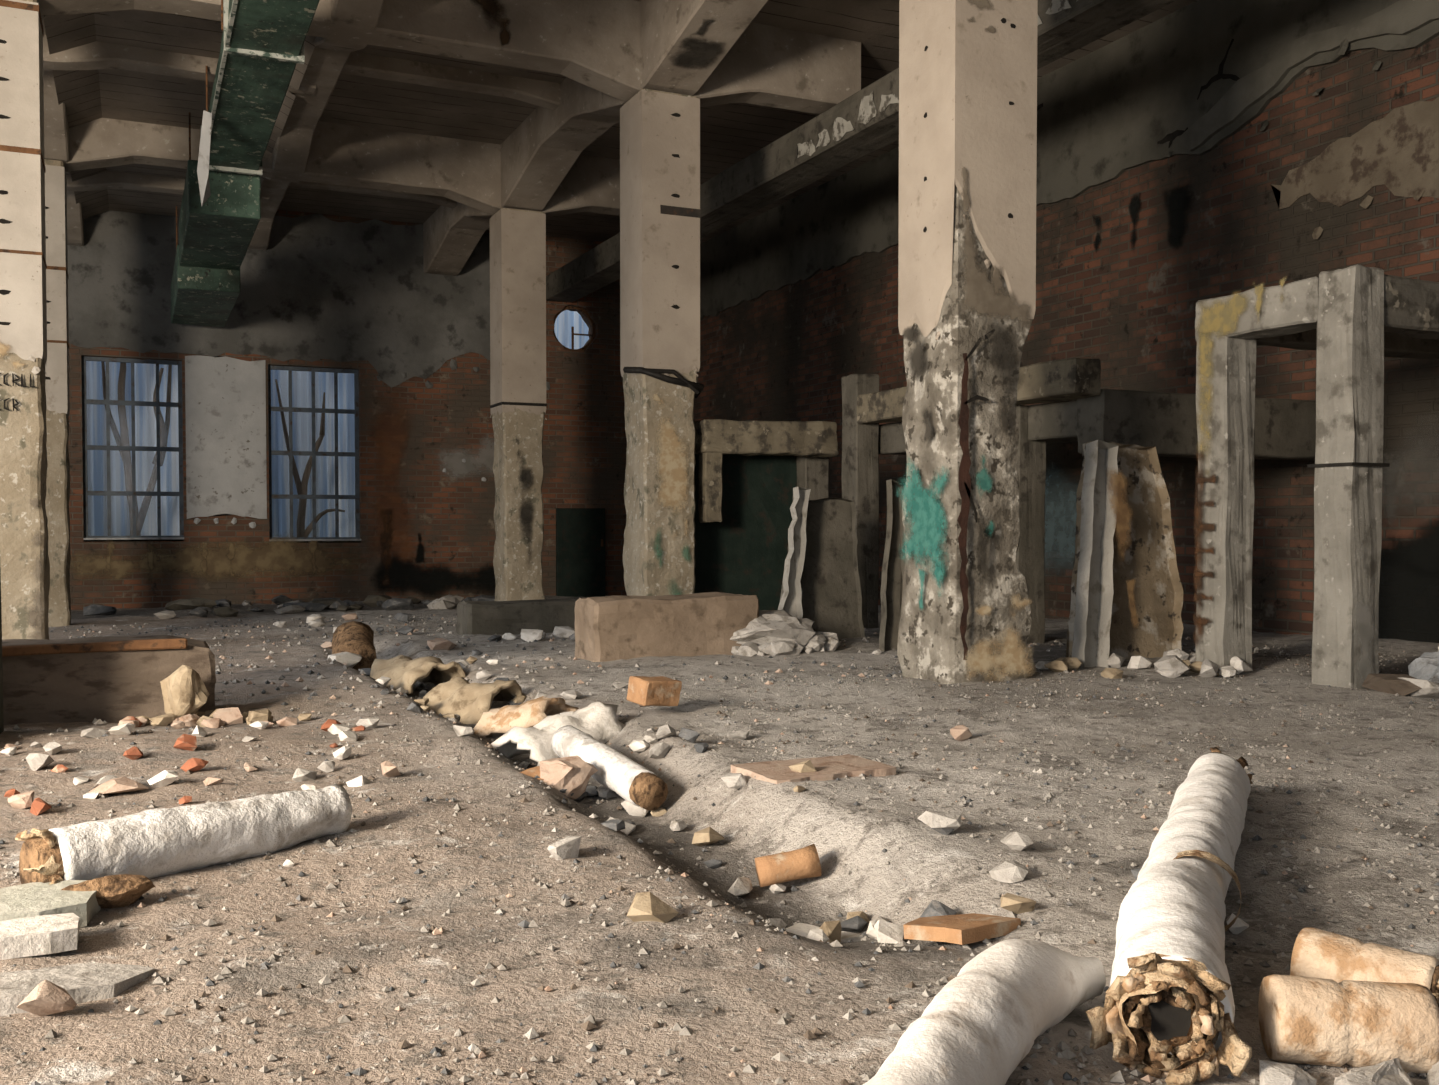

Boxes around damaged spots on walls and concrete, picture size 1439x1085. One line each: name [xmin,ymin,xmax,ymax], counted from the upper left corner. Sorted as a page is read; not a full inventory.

water stain [472,0,510,45]
water stain [674,20,722,68]
peeling [620,0,1439,384]
spalling [658,419,688,536]
water stain [1381,520,1439,576]
spalling [1012,596,1029,608]
spalling [966,629,1032,679]